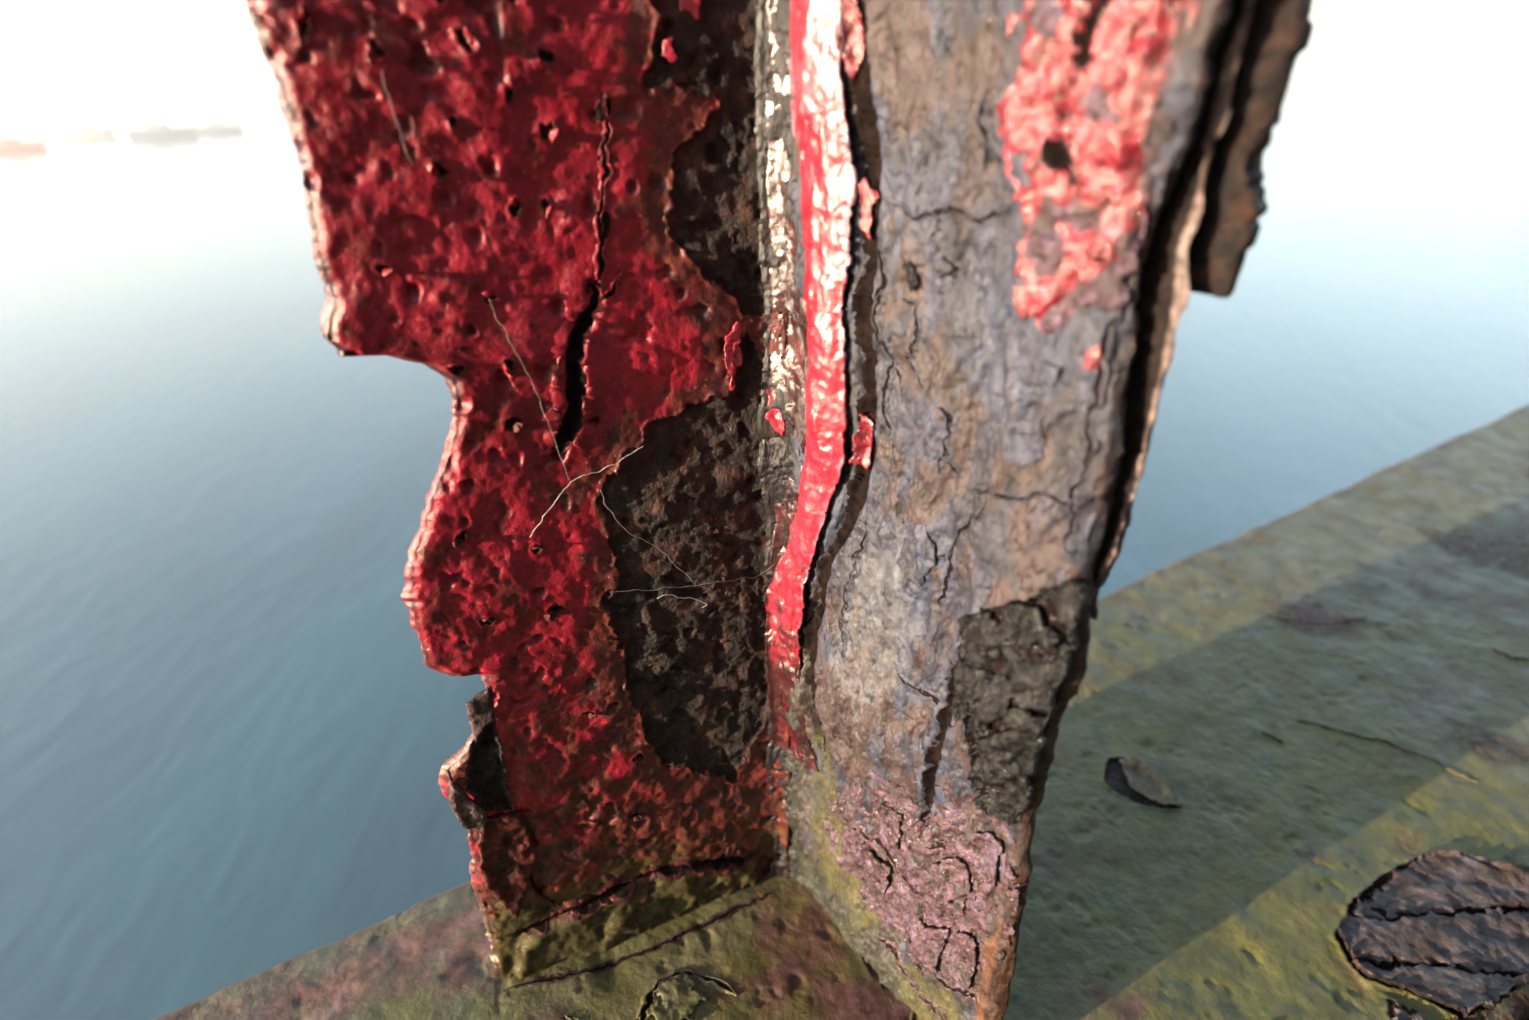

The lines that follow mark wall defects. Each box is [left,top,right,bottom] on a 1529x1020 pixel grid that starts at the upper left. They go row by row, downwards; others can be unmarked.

crack [541,94,623,454]
crack [801,0,1188,835]
peeling [821,0,1315,990]
spalling [447,686,538,918]
crack [503,846,774,1020]
crack [860,932,986,1020]
peeling [1338,848,1529,1020]